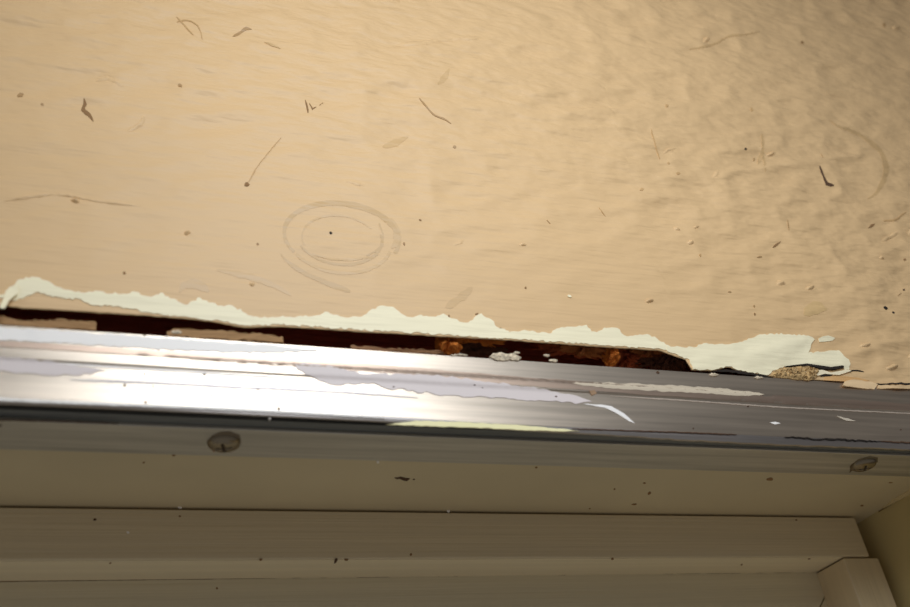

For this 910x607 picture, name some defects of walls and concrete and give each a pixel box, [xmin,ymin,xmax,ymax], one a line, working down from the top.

peeling [0,277,910,390]